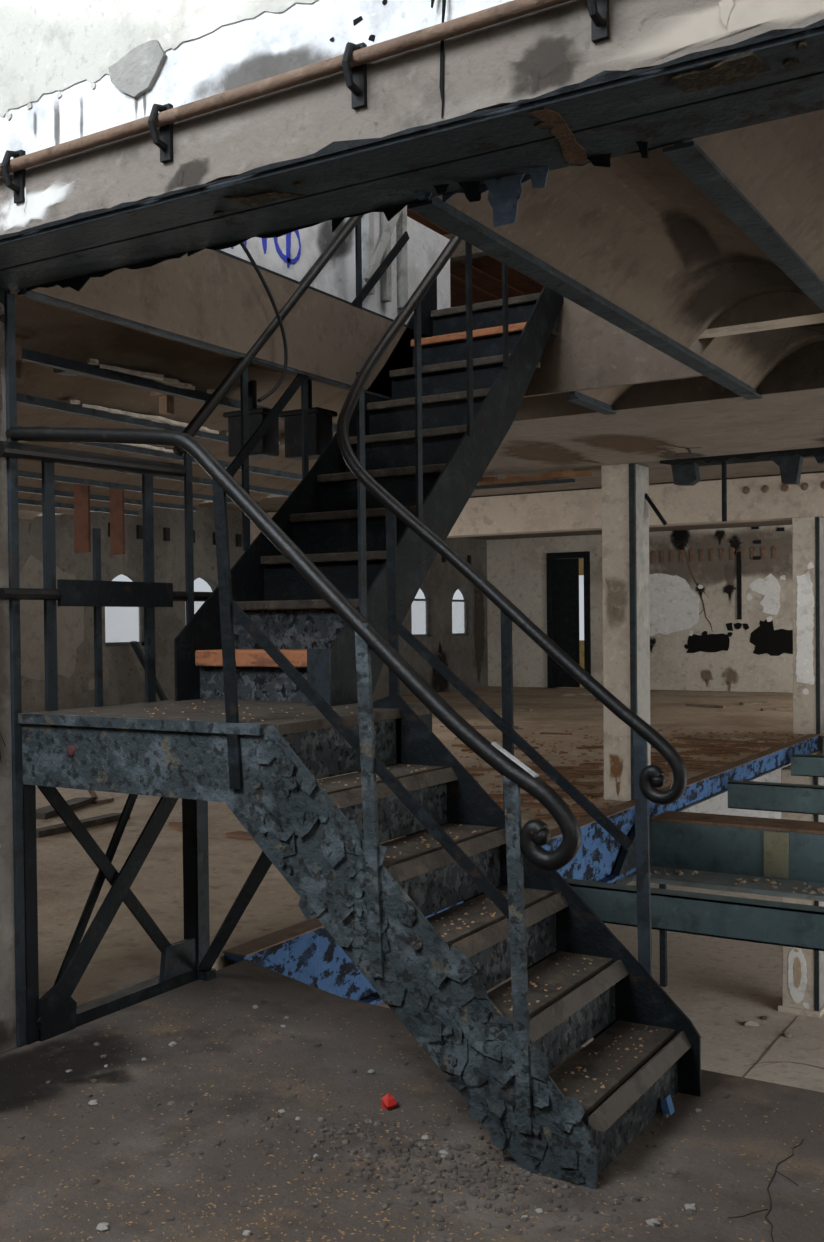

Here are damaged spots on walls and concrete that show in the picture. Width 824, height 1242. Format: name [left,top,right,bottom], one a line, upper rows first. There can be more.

peeling [0,0,318,120]
leakage [513,37,574,93]
flaking render [0,19,824,240]
peeling [26,167,549,292]
peeling [649,562,815,695]
crack [727,1138,804,1242]